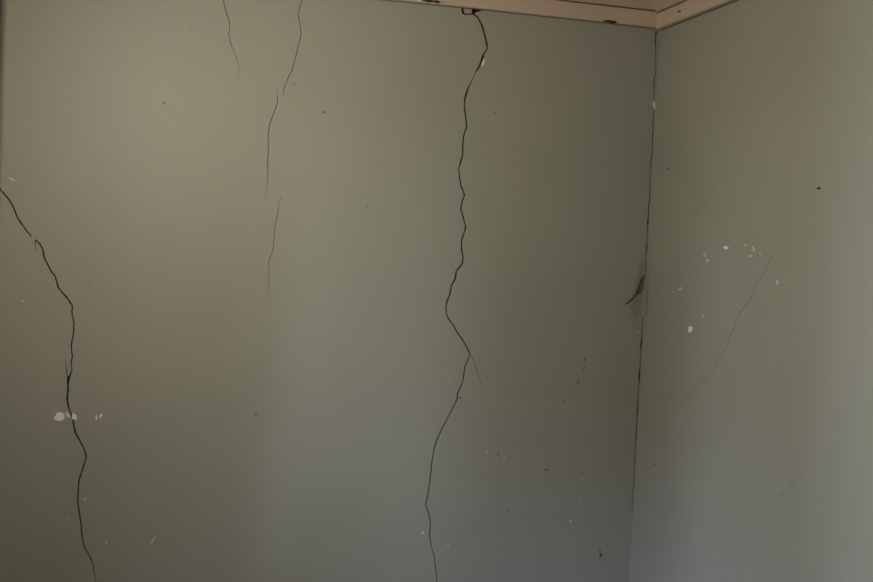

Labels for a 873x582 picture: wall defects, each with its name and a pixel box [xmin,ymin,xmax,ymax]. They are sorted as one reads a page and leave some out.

crack [0,188,102,582]
crack [266,0,303,294]
crack [425,13,488,582]